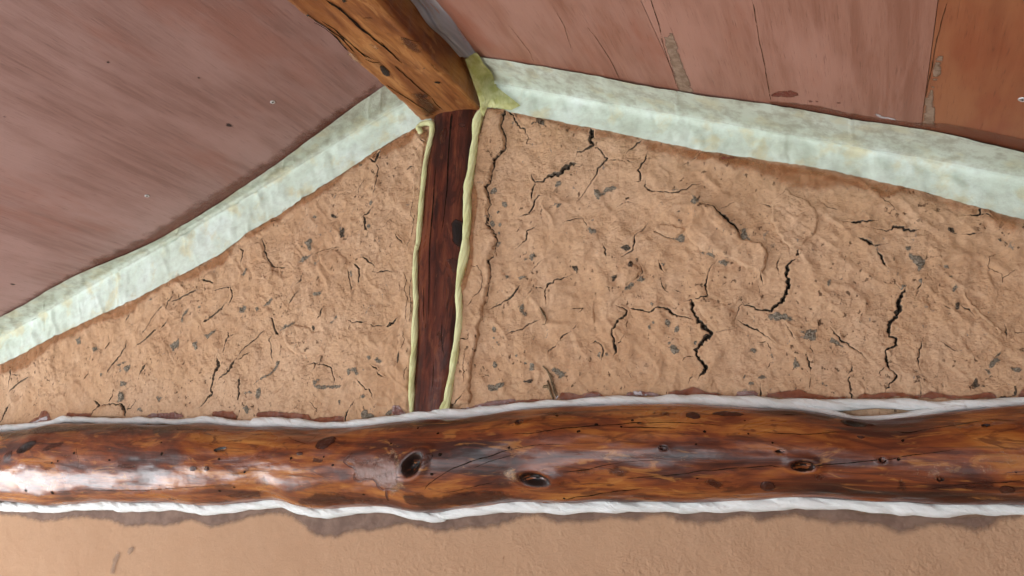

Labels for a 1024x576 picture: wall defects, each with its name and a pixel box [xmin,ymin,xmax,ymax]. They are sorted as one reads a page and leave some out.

crack [84,137,428,422]
crack [468,109,956,400]